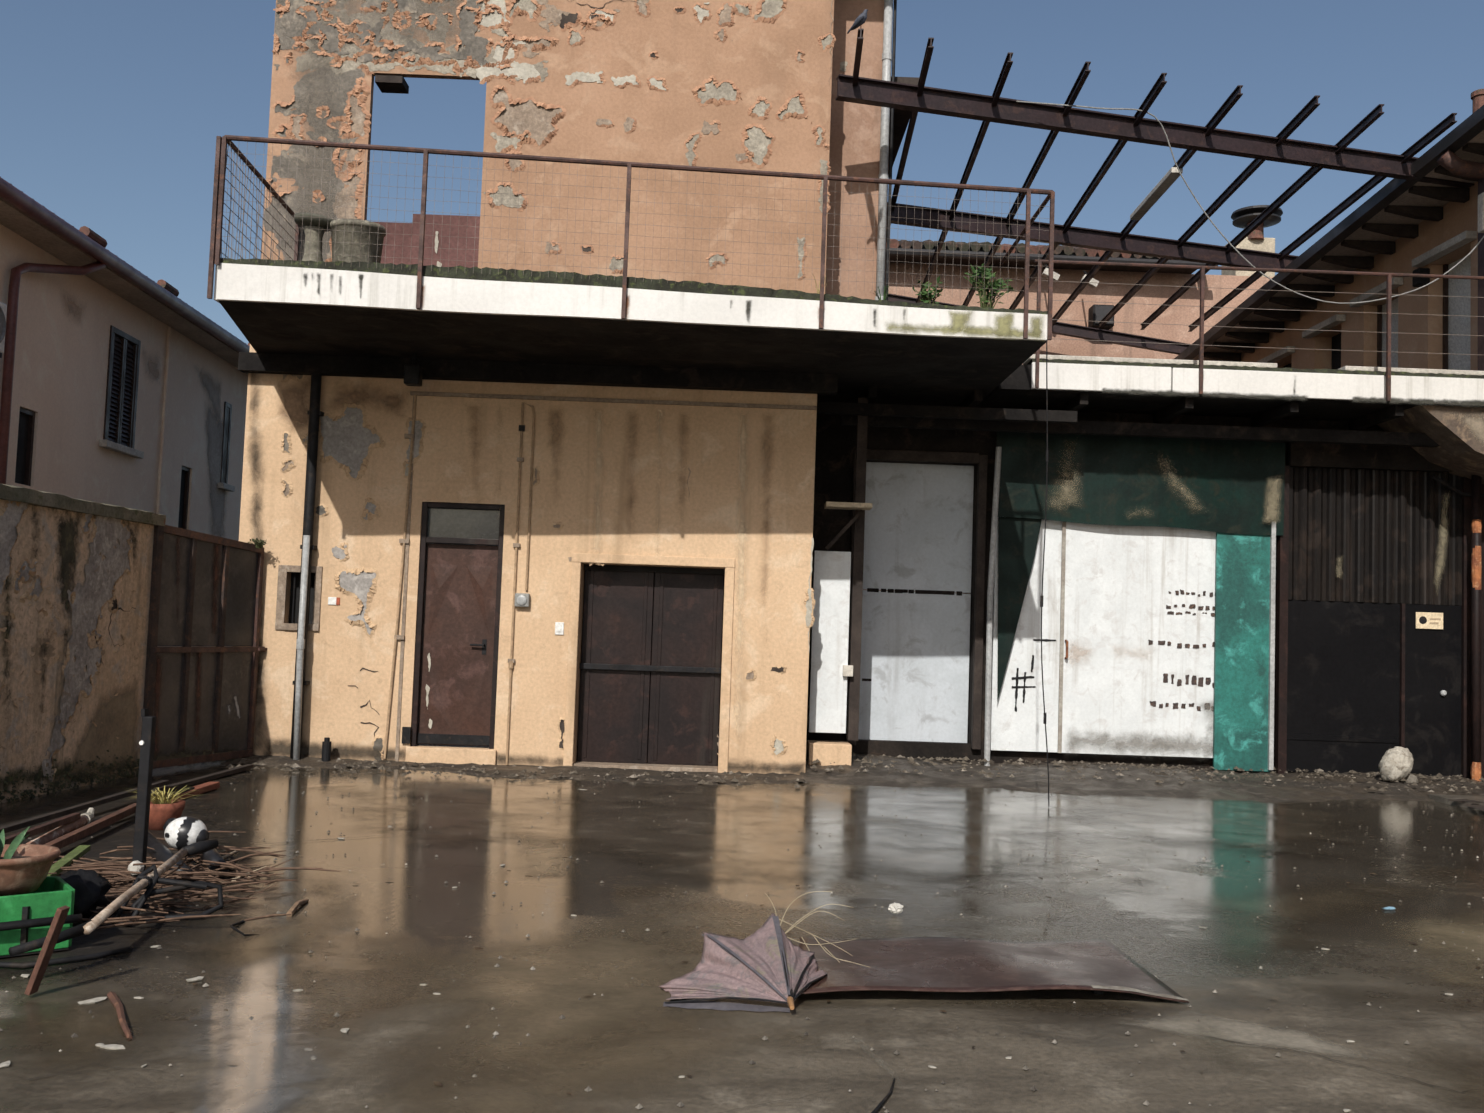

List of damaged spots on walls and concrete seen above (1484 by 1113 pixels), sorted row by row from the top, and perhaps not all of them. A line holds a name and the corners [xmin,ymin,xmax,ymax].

peeling [673,0,788,43]
peeling [795,33,848,72]
peeling [271,0,669,220]
peeling [684,75,831,213]
peeling [267,173,292,204]
peeling [580,244,624,274]
peeling [705,252,729,270]
leakage [874,310,1041,338]
peeling [332,542,379,638]
peeling [0,500,132,785]